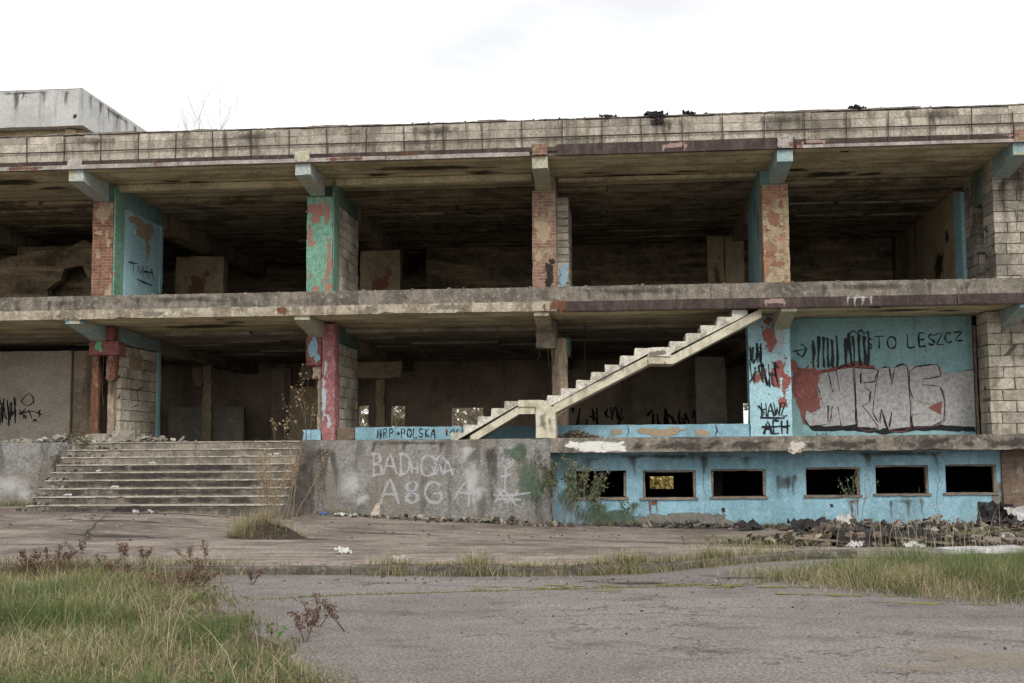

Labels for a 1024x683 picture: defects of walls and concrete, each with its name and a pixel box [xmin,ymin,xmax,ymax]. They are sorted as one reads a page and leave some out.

peeling [94,206,111,248]
peeling [129,214,153,260]
peeling [306,198,332,292]
peeling [534,214,568,287]
peeling [305,337,331,428]
peeling [752,316,824,408]
peeling [565,429,627,453]
peeling [637,427,711,437]
damp [655,441,719,470]